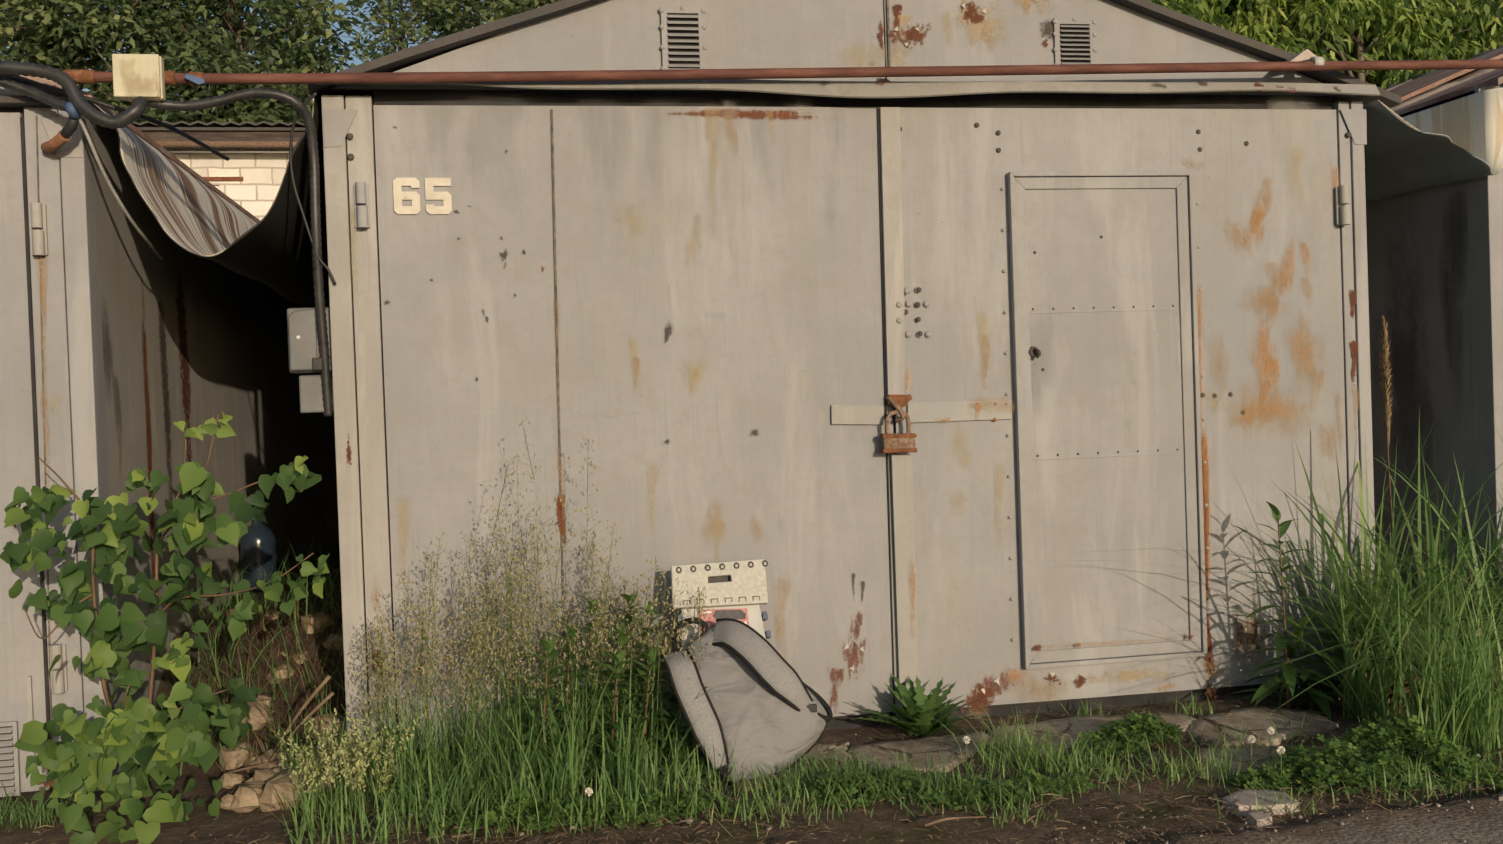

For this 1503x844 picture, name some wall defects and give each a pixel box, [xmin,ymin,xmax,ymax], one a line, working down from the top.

rust [886,4,928,48]
rust [674,109,812,119]
rust [1247,202,1264,235]
rust [1239,331,1289,423]
rust [1188,437,1217,700]
rust [961,672,1020,713]
rust [1045,669,1169,689]